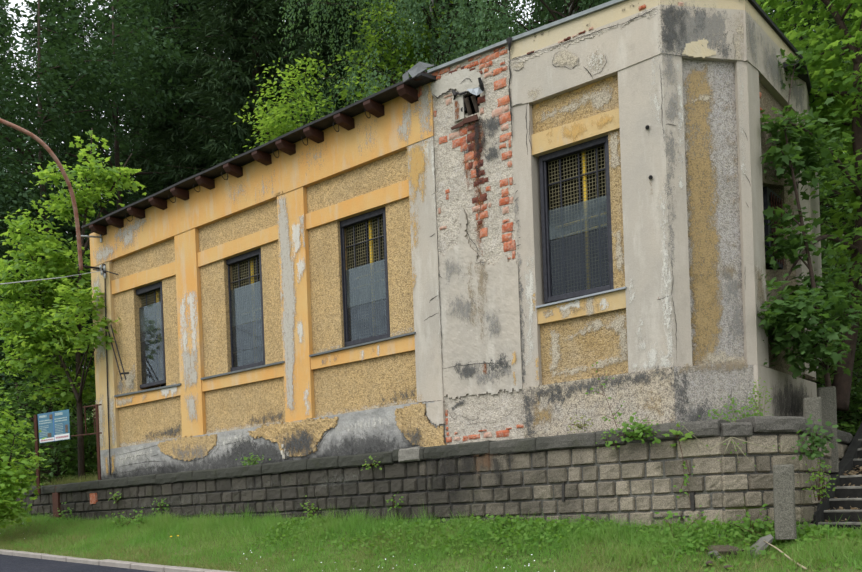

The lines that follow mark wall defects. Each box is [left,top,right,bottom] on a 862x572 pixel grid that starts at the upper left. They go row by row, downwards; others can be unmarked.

flaking render [682,38,716,59]
peeling [397,4,659,272]
water stain [455,3,754,438]
peeling [161,291,199,422]
flaking render [158,434,217,461]
peeling [255,171,311,415]
peeling [395,389,524,447]